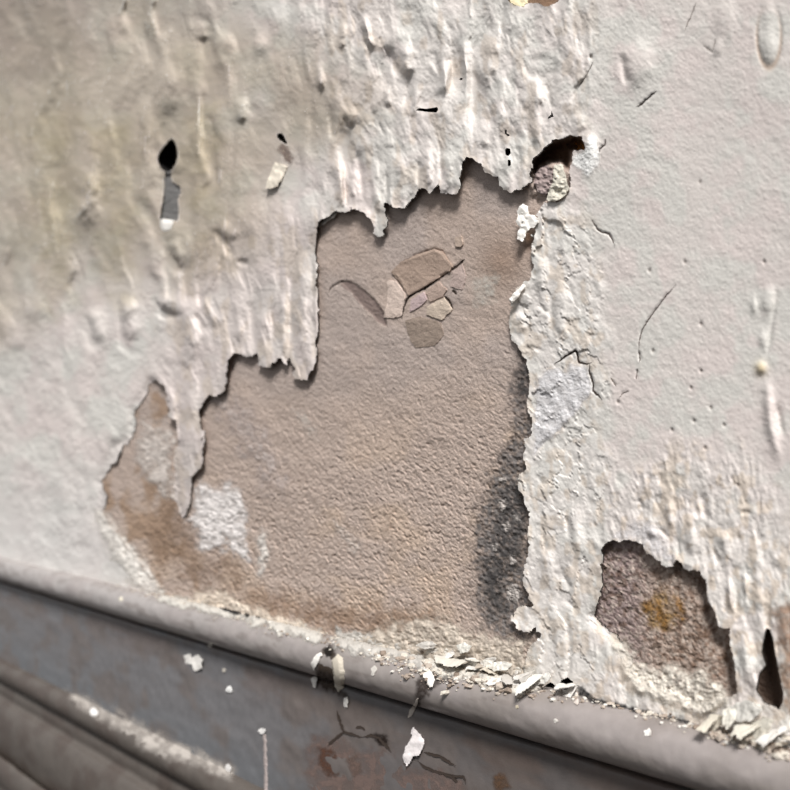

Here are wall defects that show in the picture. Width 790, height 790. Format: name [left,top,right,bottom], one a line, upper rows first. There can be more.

crack [556,289,672,398]
water stain [136,422,176,499]
spalling [102,135,784,709]
water stain [188,482,269,575]
water stain [334,364,537,693]